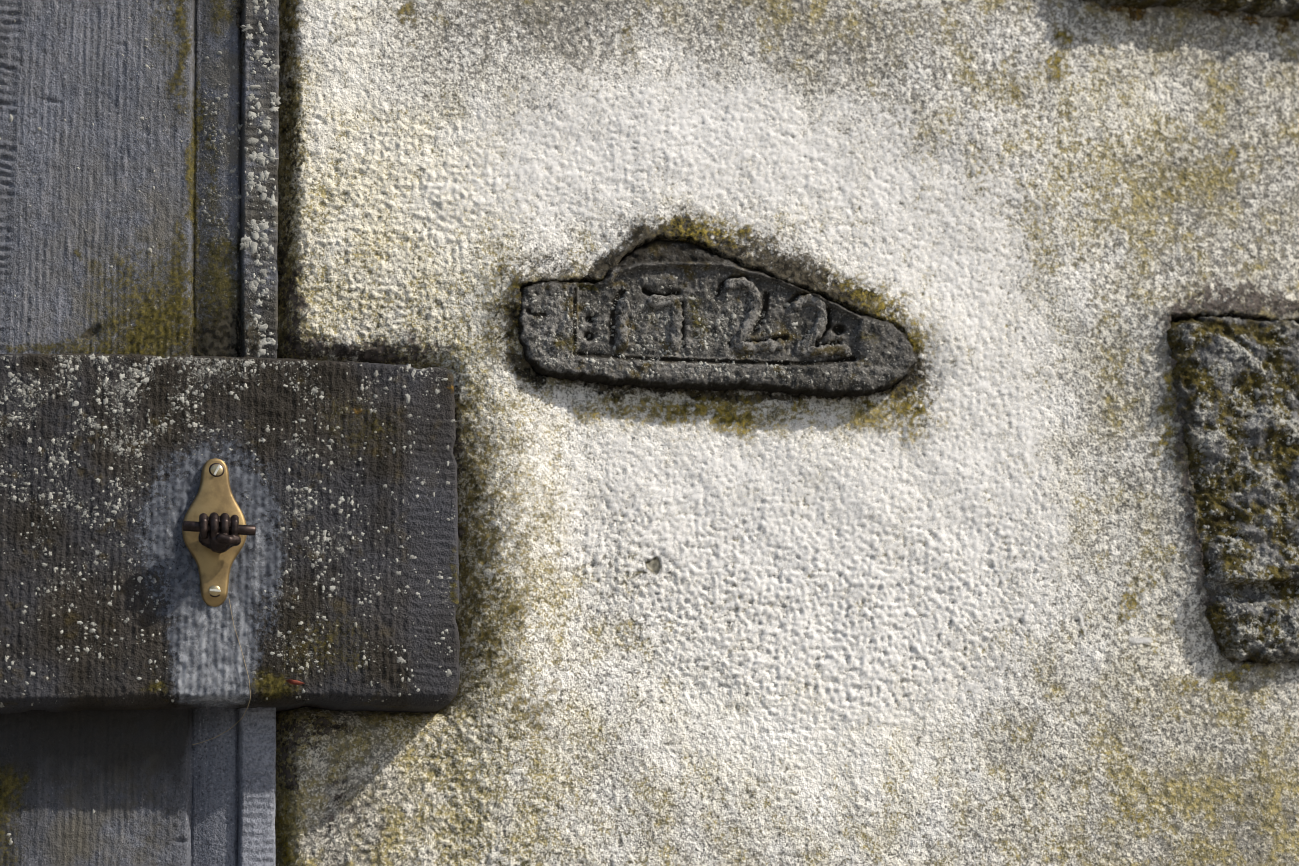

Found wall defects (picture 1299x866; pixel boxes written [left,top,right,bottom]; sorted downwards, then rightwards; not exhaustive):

water stain [482,204,947,443]
water stain [134,433,287,708]